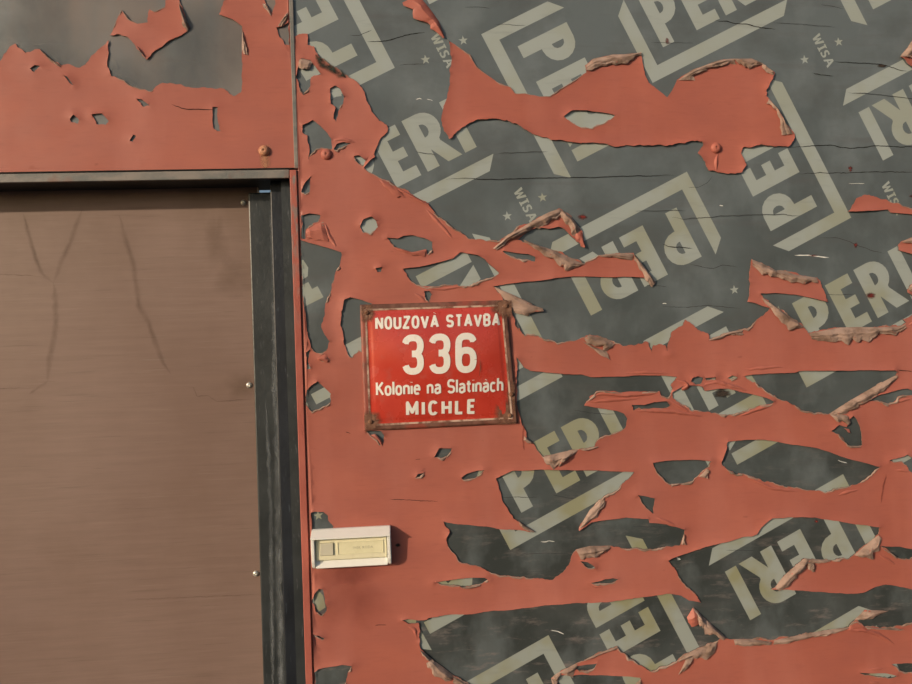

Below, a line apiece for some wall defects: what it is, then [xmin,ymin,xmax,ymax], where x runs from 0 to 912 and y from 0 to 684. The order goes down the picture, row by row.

peeling [263,0,276,16]
peeling [0,0,248,107]
peeling [93,114,108,125]
peeling [277,0,912,369]
peeling [306,382,331,413]
peeling [366,431,384,446]
peeling [311,512,334,529]
peeling [404,359,912,684]
peeling [313,589,327,616]
peeling [315,665,352,684]